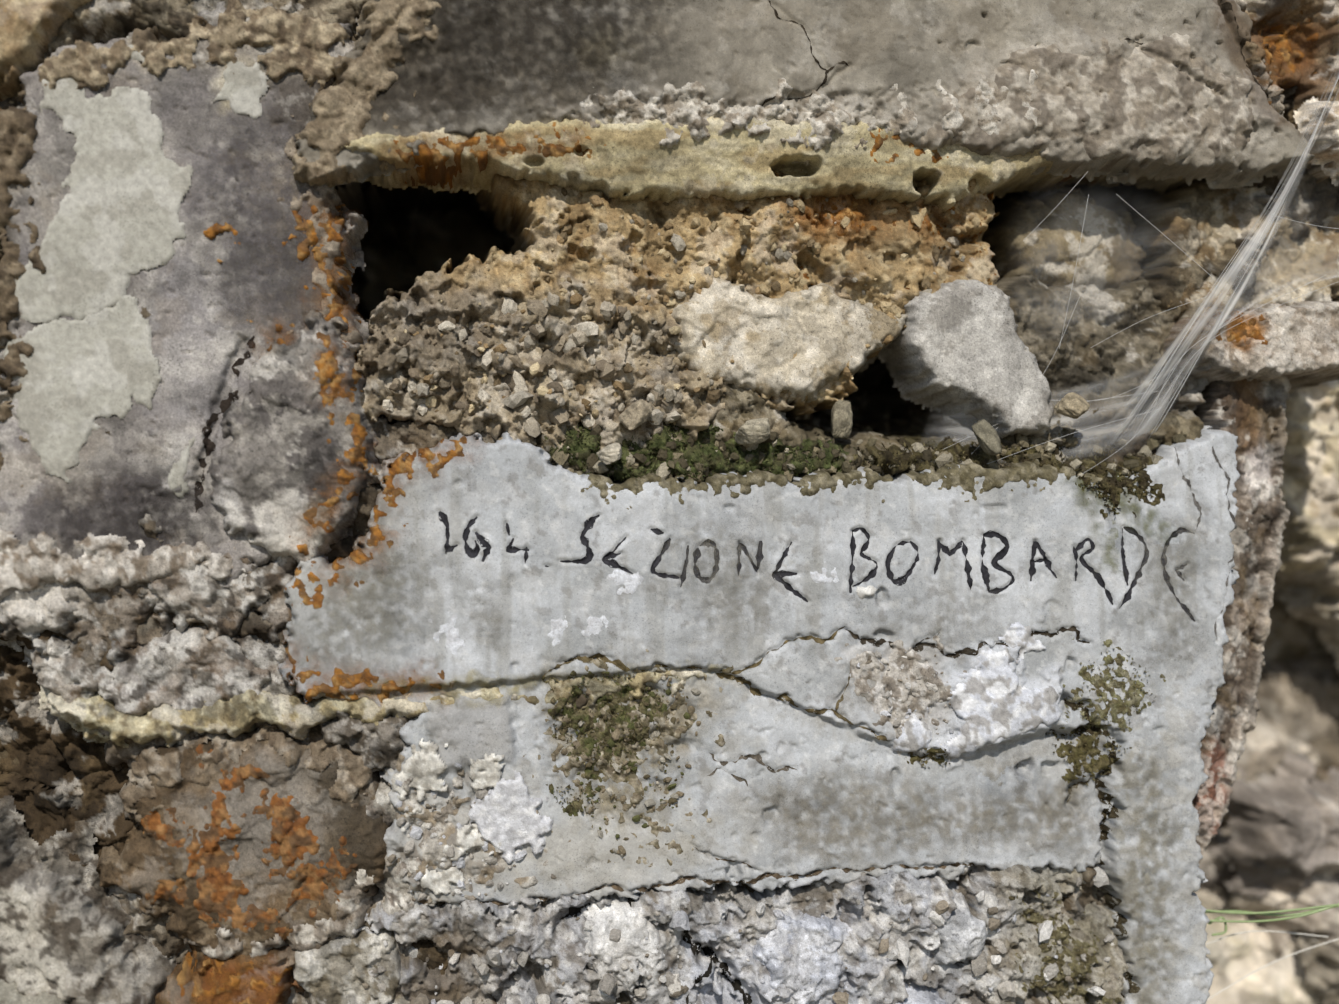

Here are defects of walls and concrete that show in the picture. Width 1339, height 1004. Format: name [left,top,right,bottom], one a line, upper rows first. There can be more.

crack [762,0,848,106]
crack [541,626,1090,759]
peeling [834,622,1062,762]
crack [708,753,797,786]
crack [1050,698,1129,939]
crack [412,848,974,920]
crack [1121,971,1140,998]